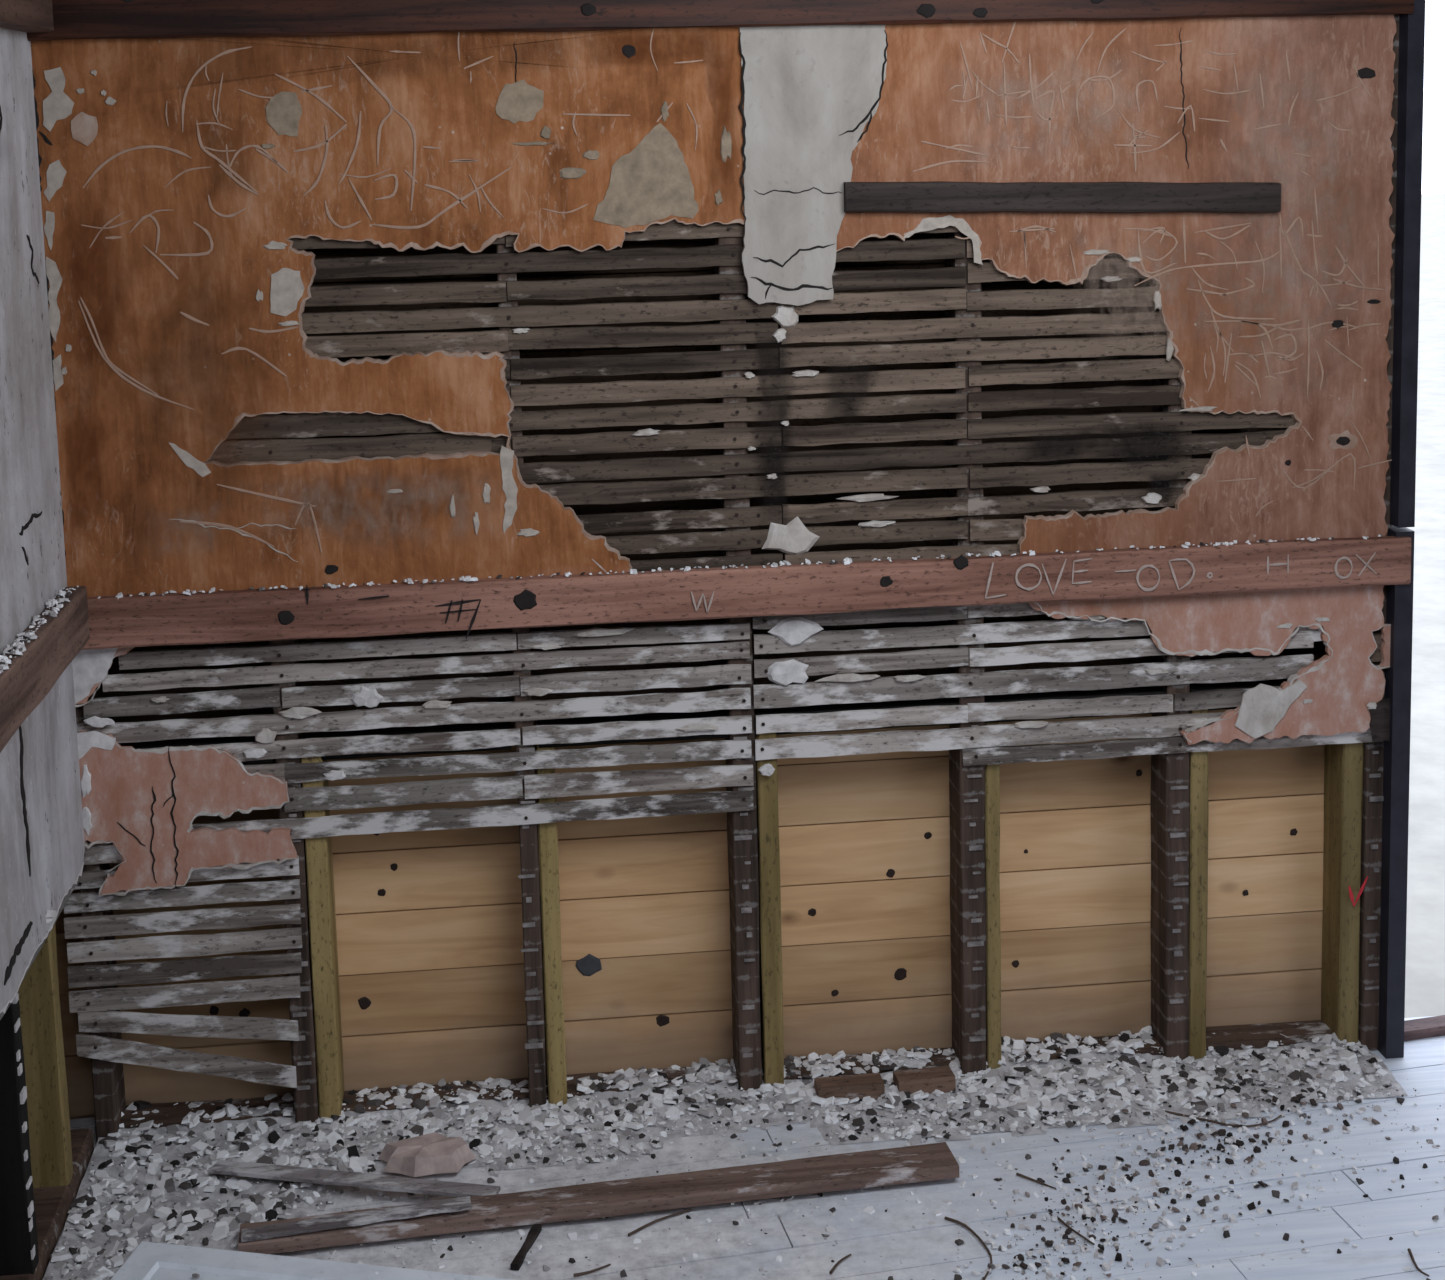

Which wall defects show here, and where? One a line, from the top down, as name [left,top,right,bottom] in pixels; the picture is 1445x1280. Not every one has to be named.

crack [0,69,52,191]
crack [739,32,841,221]
crack [839,30,888,142]
crack [26,235,56,412]
flaking render [168,101,1302,572]
crack [751,244,834,299]
crack [19,726,31,877]
crack [117,744,179,886]
flaking render [0,602,1391,1088]
crack [4,921,33,986]